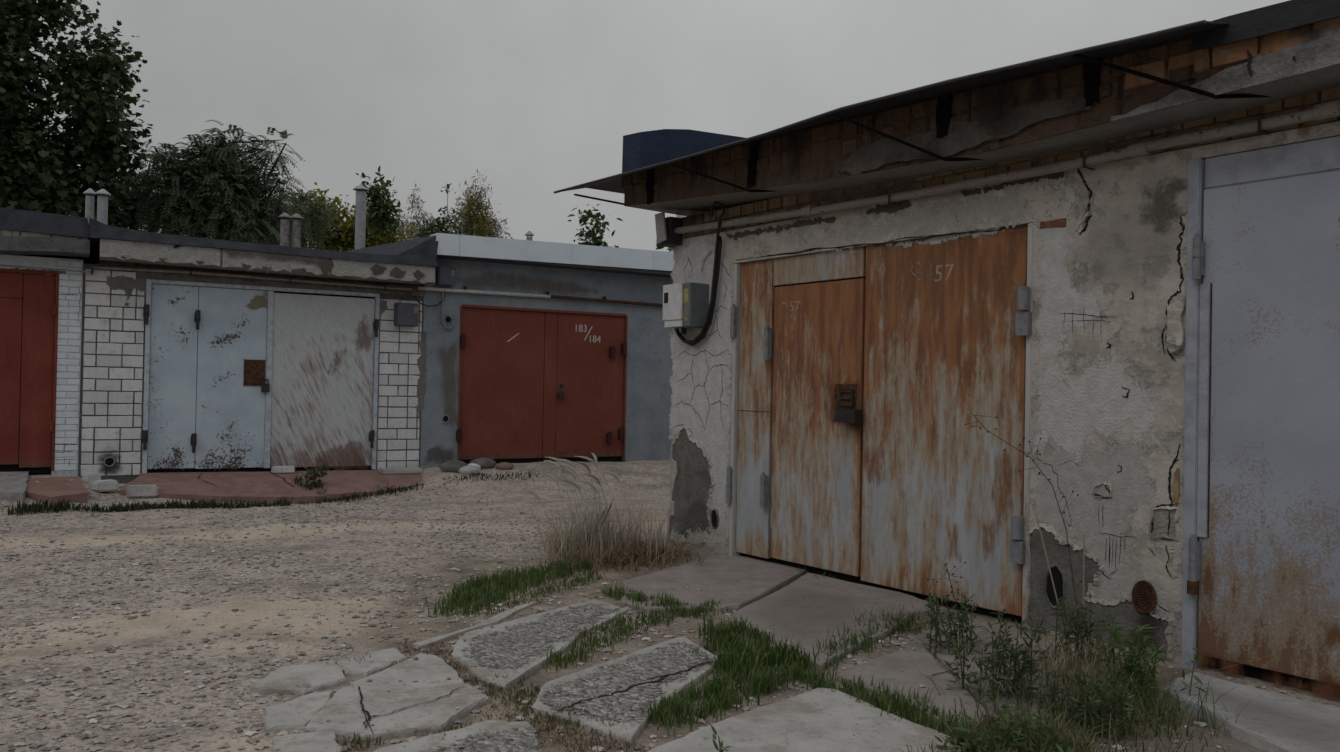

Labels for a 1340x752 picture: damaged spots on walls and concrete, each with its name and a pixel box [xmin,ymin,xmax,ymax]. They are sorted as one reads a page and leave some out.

crack [1071,168,1093,235]
peeling [877,228,1001,251]
peeling [208,315,250,348]
crack [673,216,1030,434]
crack [1063,292,1134,349]
crack [1161,214,1187,361]
peeling [165,440,242,471]
peeling [667,239,738,548]
peeling [1023,183,1182,663]
rust [1274,677,1340,701]